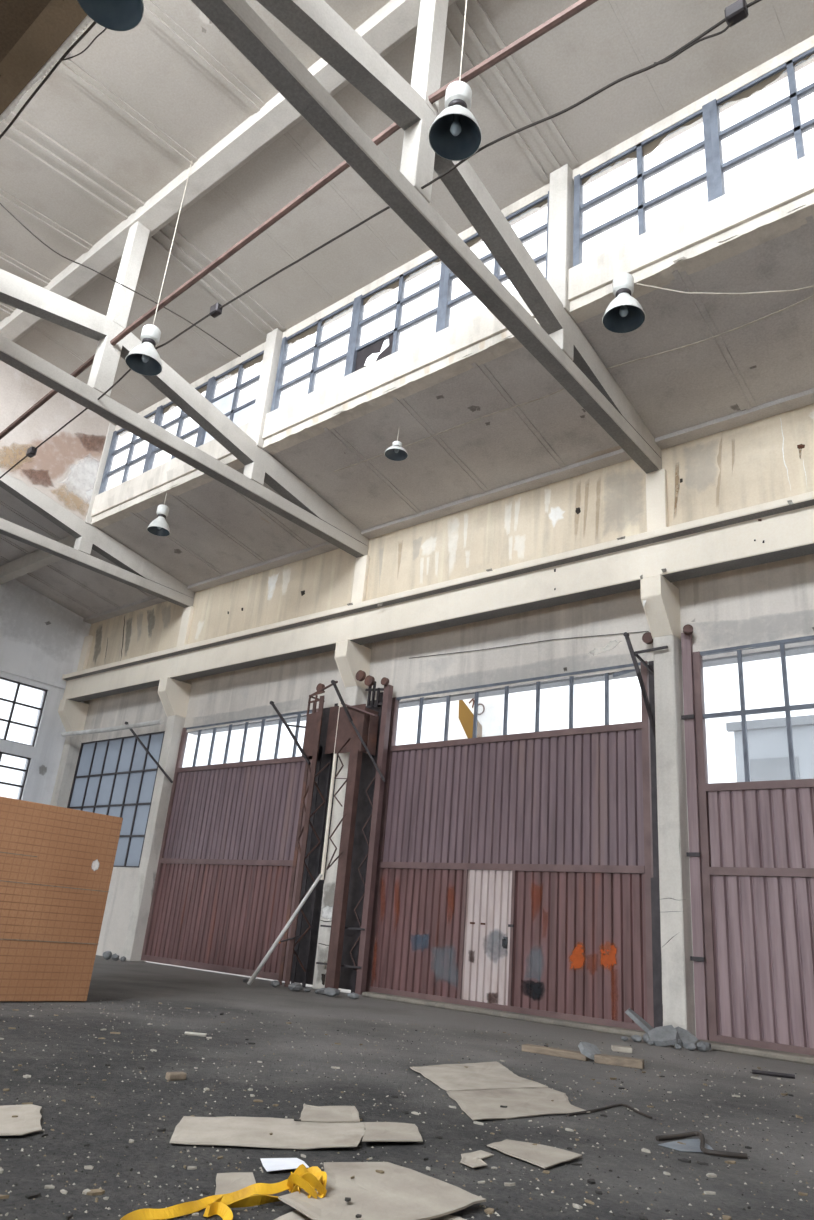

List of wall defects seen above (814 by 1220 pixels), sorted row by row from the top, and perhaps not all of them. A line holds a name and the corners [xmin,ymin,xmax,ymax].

peeling [0,429,126,514]
damp [504,495,526,562]
damp [544,466,647,545]
damp [674,431,735,510]
damp [124,603,172,658]